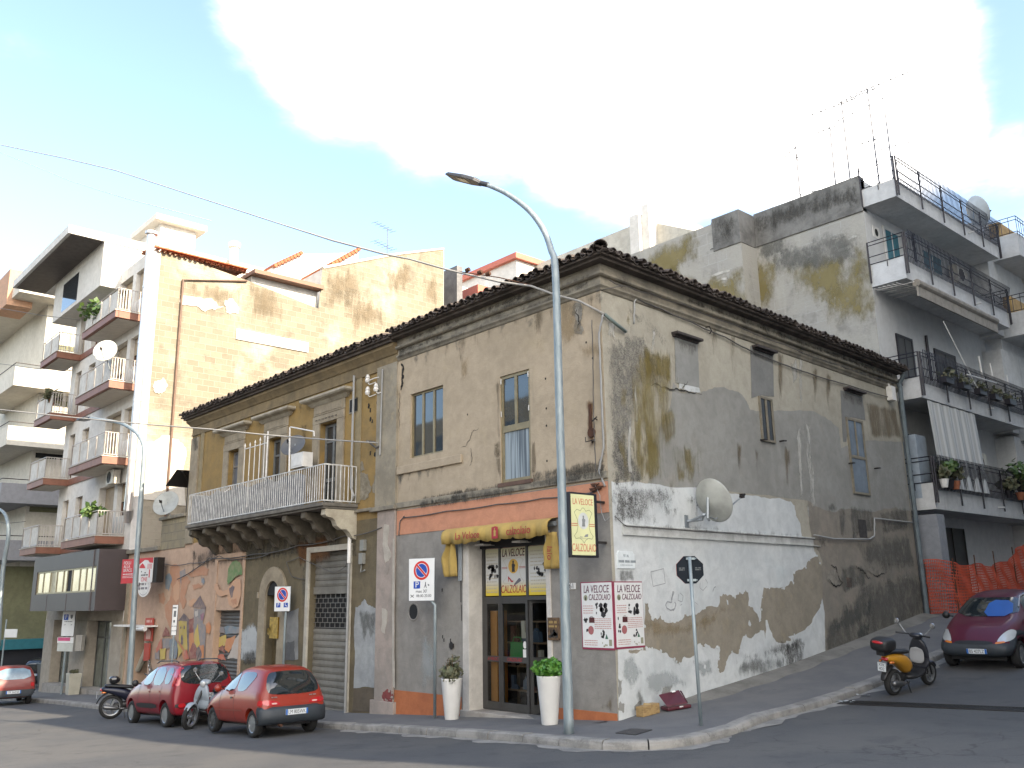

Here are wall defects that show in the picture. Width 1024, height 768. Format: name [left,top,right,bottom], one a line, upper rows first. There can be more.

leakage [763,236,850,265]
peeling [179,294,239,314]
leakage [328,275,381,327]
peeling [153,378,168,393]
leakage [622,385,658,476]
peeling [144,435,187,506]
peeling [629,556,885,673]